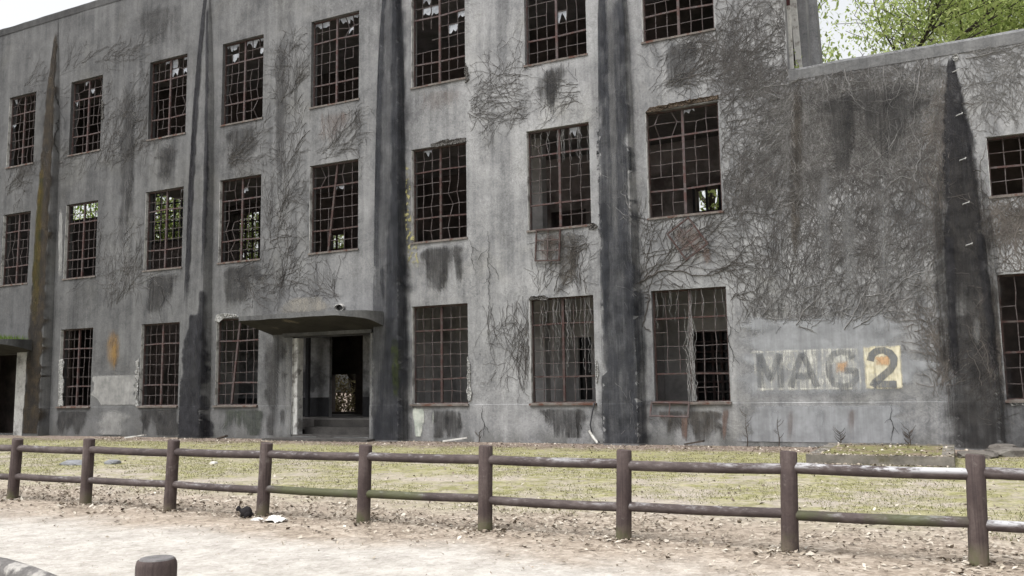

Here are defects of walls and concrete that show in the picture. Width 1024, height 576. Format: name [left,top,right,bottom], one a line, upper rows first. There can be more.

water stain [22,36,57,433]
water stain [372,0,462,440]
water stain [539,68,564,106]
water stain [542,409,585,438]
water stain [596,0,648,444]
water stain [935,59,1002,448]